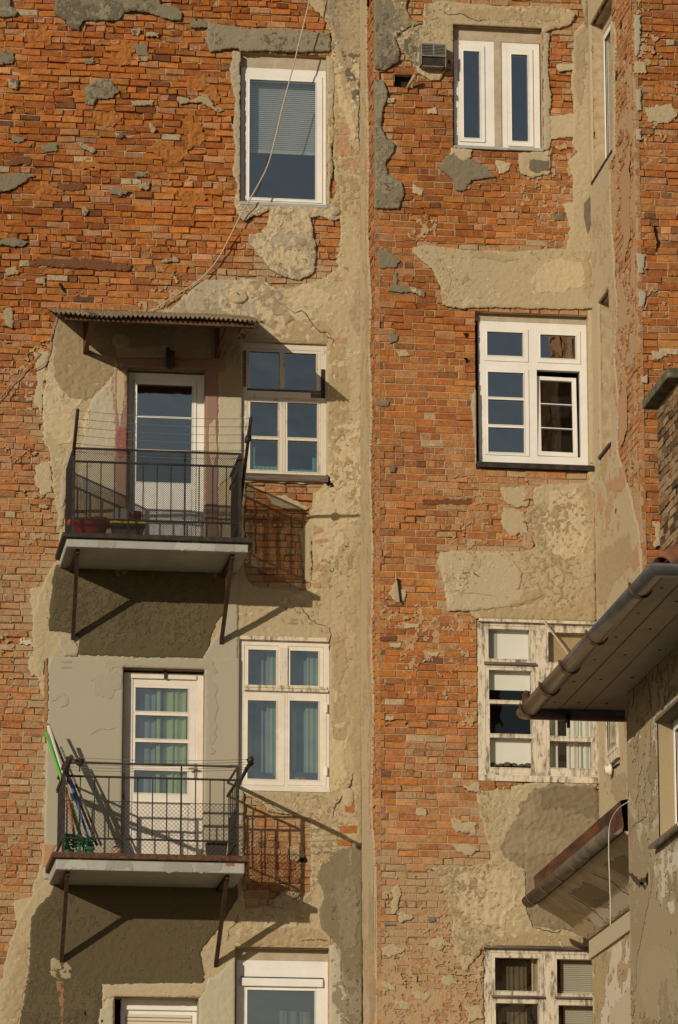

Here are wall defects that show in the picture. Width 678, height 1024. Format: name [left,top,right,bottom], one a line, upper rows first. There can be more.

crack [288,308,334,343]
peeling [480,781,512,791]